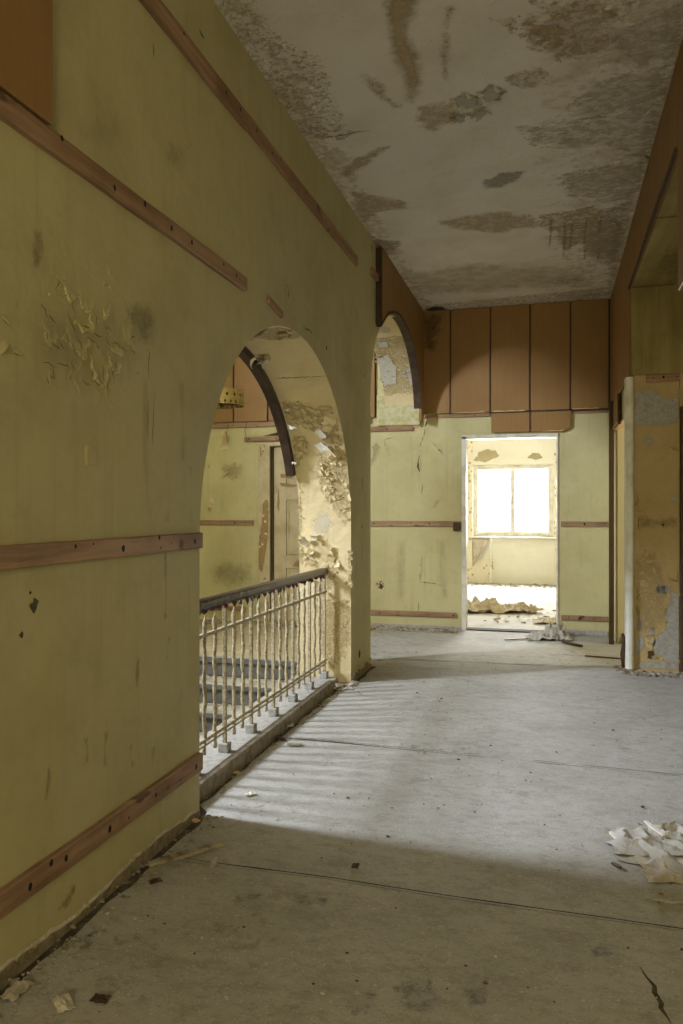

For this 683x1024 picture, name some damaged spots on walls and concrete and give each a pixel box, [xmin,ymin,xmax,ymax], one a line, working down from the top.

water stain [389,0,418,92]
flaking render [448,85,508,125]
water stain [520,3,683,203]
water stain [485,172,522,187]
flaking render [375,327,419,425]
crack [417,421,443,493]
flaking render [635,389,680,445]
peeling [199,401,372,681]
peeling [634,534,680,670]
crack [640,967,672,1024]